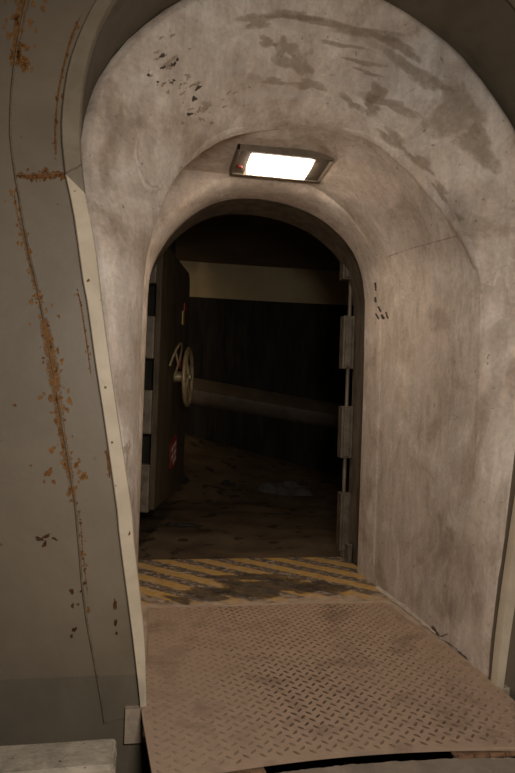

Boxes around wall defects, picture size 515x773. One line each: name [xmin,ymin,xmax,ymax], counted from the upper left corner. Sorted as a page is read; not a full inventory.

rust [2,0,48,73]
rust [16,167,65,183]
rust [4,188,91,614]